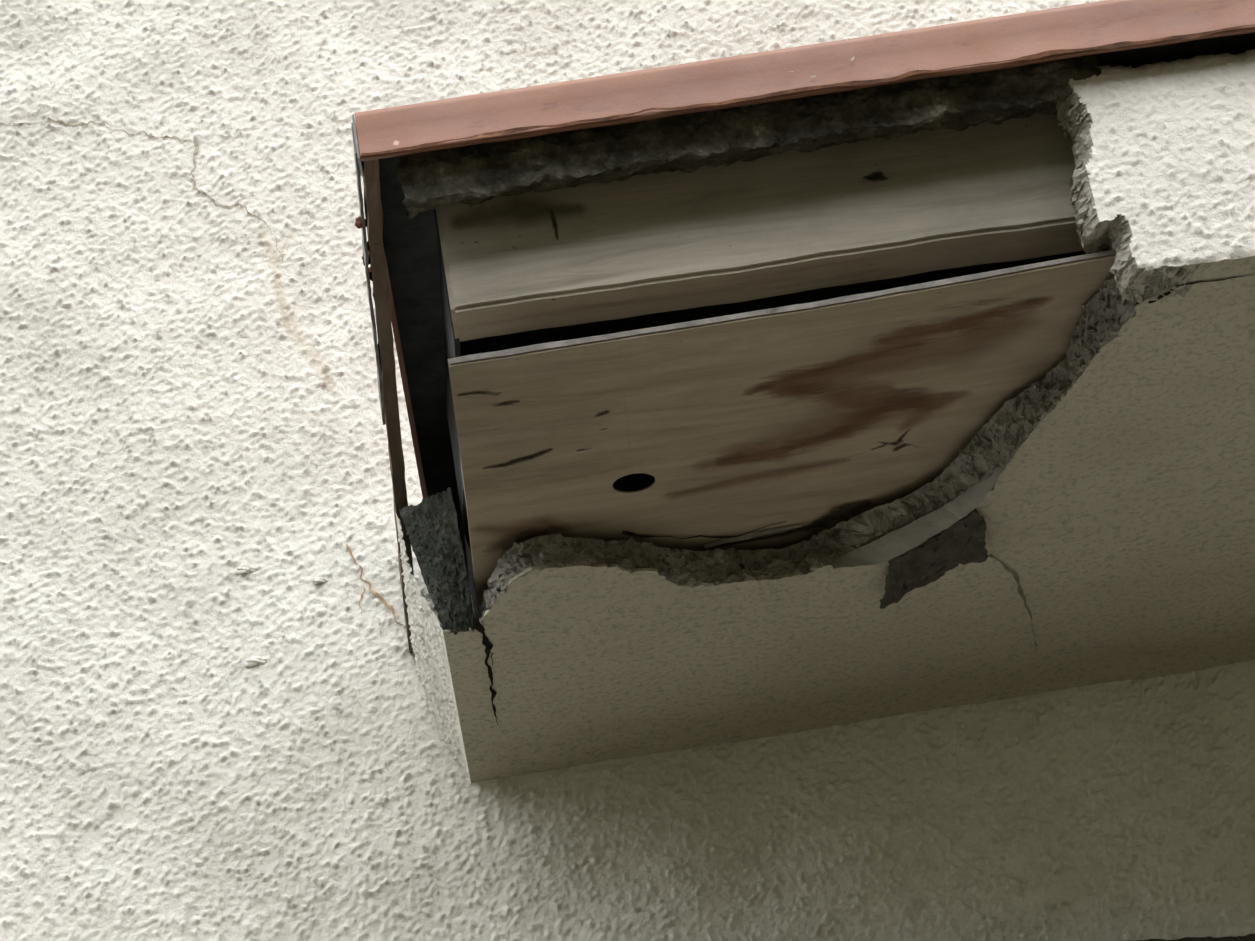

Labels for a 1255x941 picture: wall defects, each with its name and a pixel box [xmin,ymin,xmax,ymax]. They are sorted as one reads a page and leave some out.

crack [0,117,283,261]
flaking render [399,80,1203,646]
water stain [709,298,1048,483]
crack [474,619,498,725]